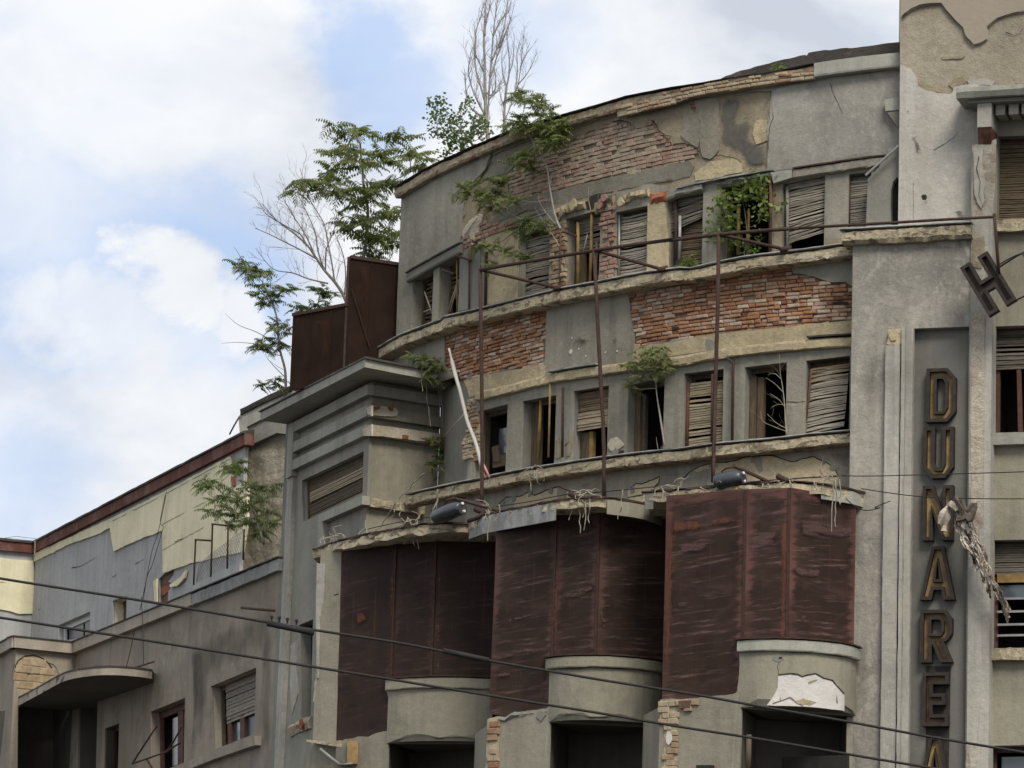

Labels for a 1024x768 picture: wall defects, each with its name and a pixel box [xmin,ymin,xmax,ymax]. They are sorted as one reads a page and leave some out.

flaking render [901,5,1024,94]
crack [612,117,742,163]
flaking render [461,70,816,300]
flaking render [629,181,852,361]
flaking render [428,298,546,462]
flaking render [628,476,660,502]
flaking render [680,439,839,488]
rust [665,512,699,659]
flaking render [13,655,55,696]
flaking render [767,656,844,711]
flaking render [658,699,699,768]